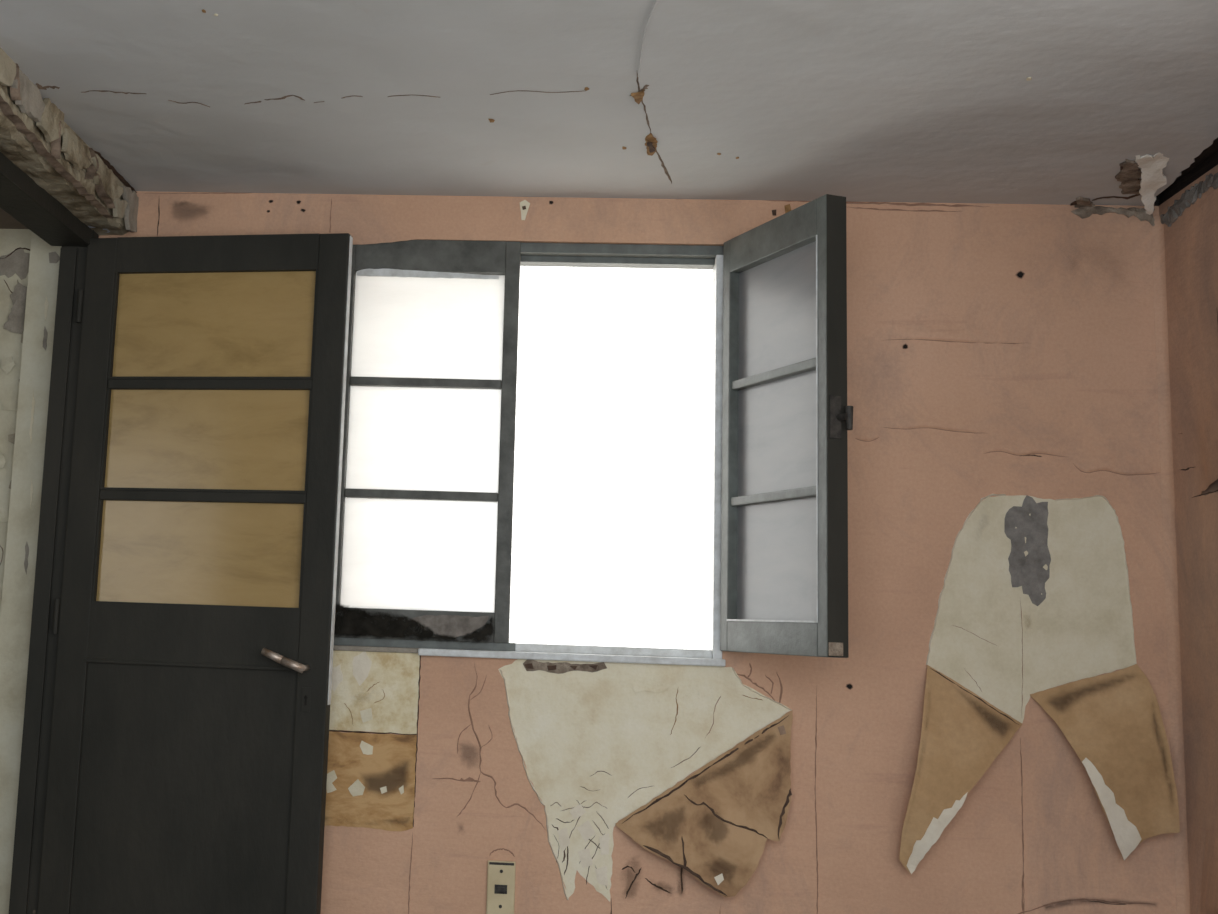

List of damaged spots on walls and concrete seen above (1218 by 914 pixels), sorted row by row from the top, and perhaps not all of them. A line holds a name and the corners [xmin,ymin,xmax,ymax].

peeling [0,48,139,232]
crack [630,74,678,200]
crack [846,201,990,212]
flaking render [927,495,1136,723]
peeling [326,770,365,796]
flaking render [329,650,420,755]
crack [433,662,700,899]
flaking render [498,659,791,902]